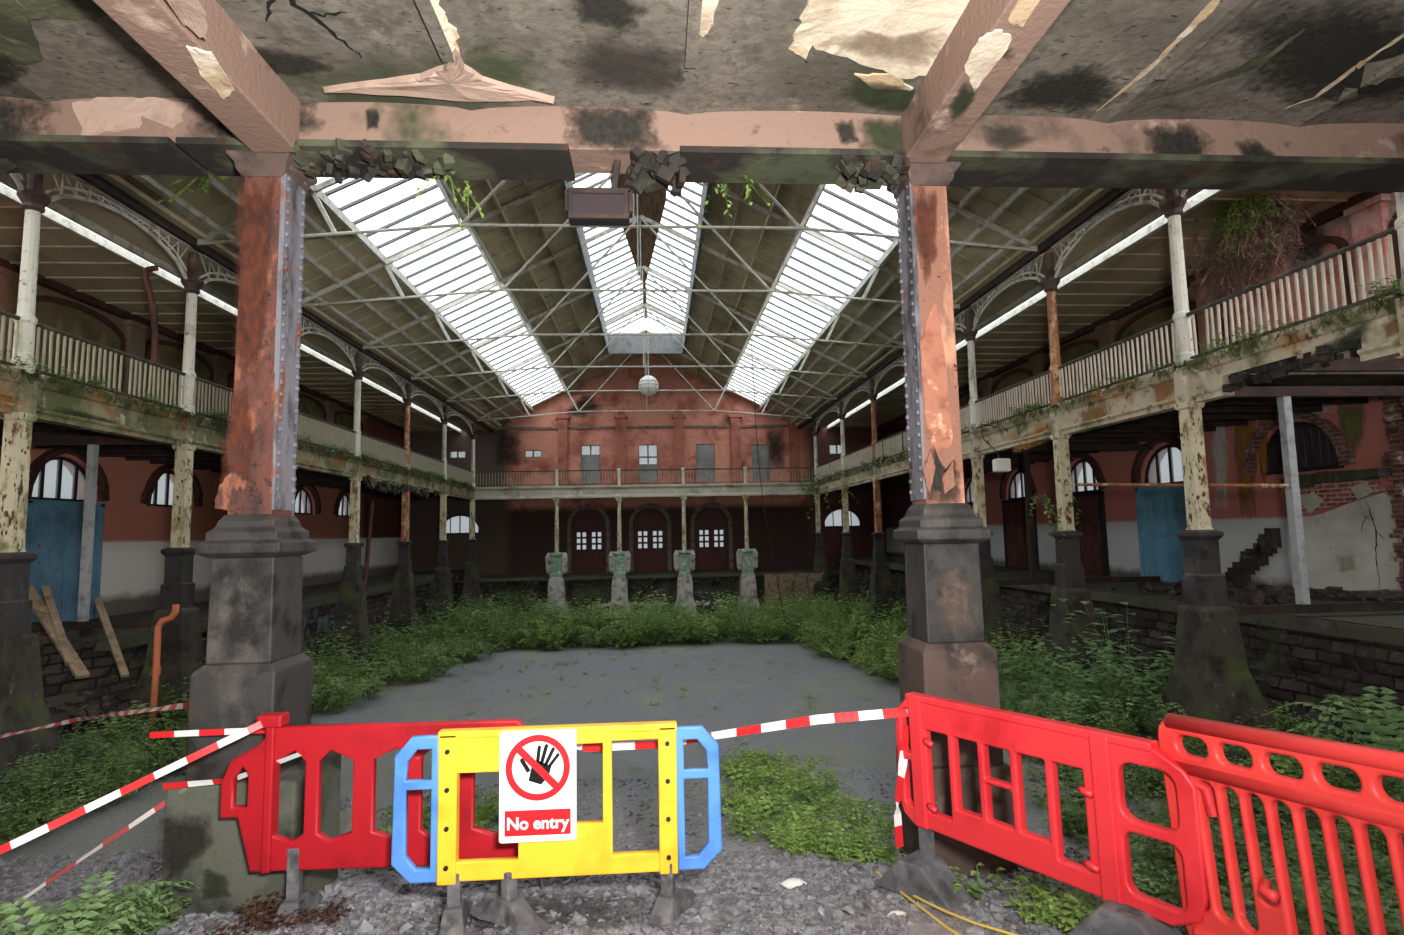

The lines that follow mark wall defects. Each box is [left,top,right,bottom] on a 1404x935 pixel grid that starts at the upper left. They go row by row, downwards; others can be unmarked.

peeling [167,0,235,100]
crack [266,0,362,58]
water stain [578,0,643,27]
peeling [788,0,970,90]
water stain [1003,66,1111,108]
water stain [989,126,1029,148]
corrosion [916,193,936,275]
corrosion [237,190,272,364]
corrosion [225,392,253,479]
corrosion [922,449,958,500]
spalling [1300,397,1404,596]